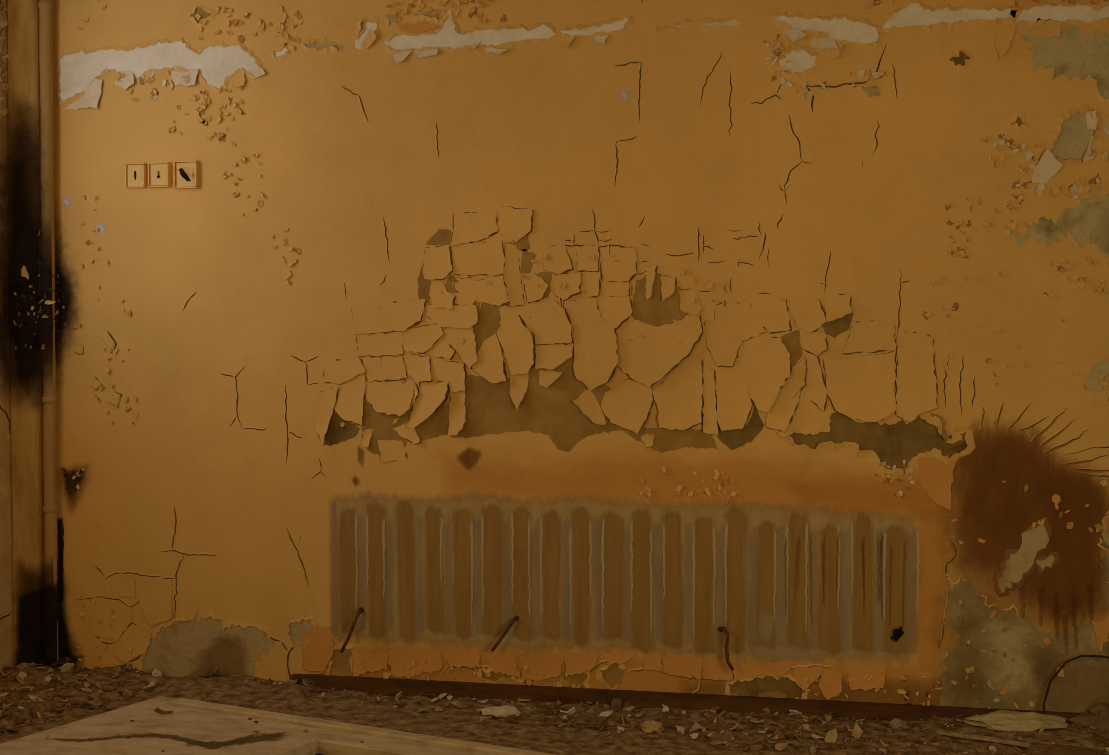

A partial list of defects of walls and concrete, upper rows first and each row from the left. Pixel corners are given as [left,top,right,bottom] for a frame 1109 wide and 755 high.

peeling [55,0,634,216]
crack [698,43,897,259]
crack [61,506,216,662]
peeling [76,574,275,677]
crack [220,354,319,462]
crack [285,528,309,588]
crack [311,459,327,480]
damp [331,494,920,661]
peeling [314,206,976,522]
peeling [286,494,1109,713]
corrosion [960,402,1109,617]